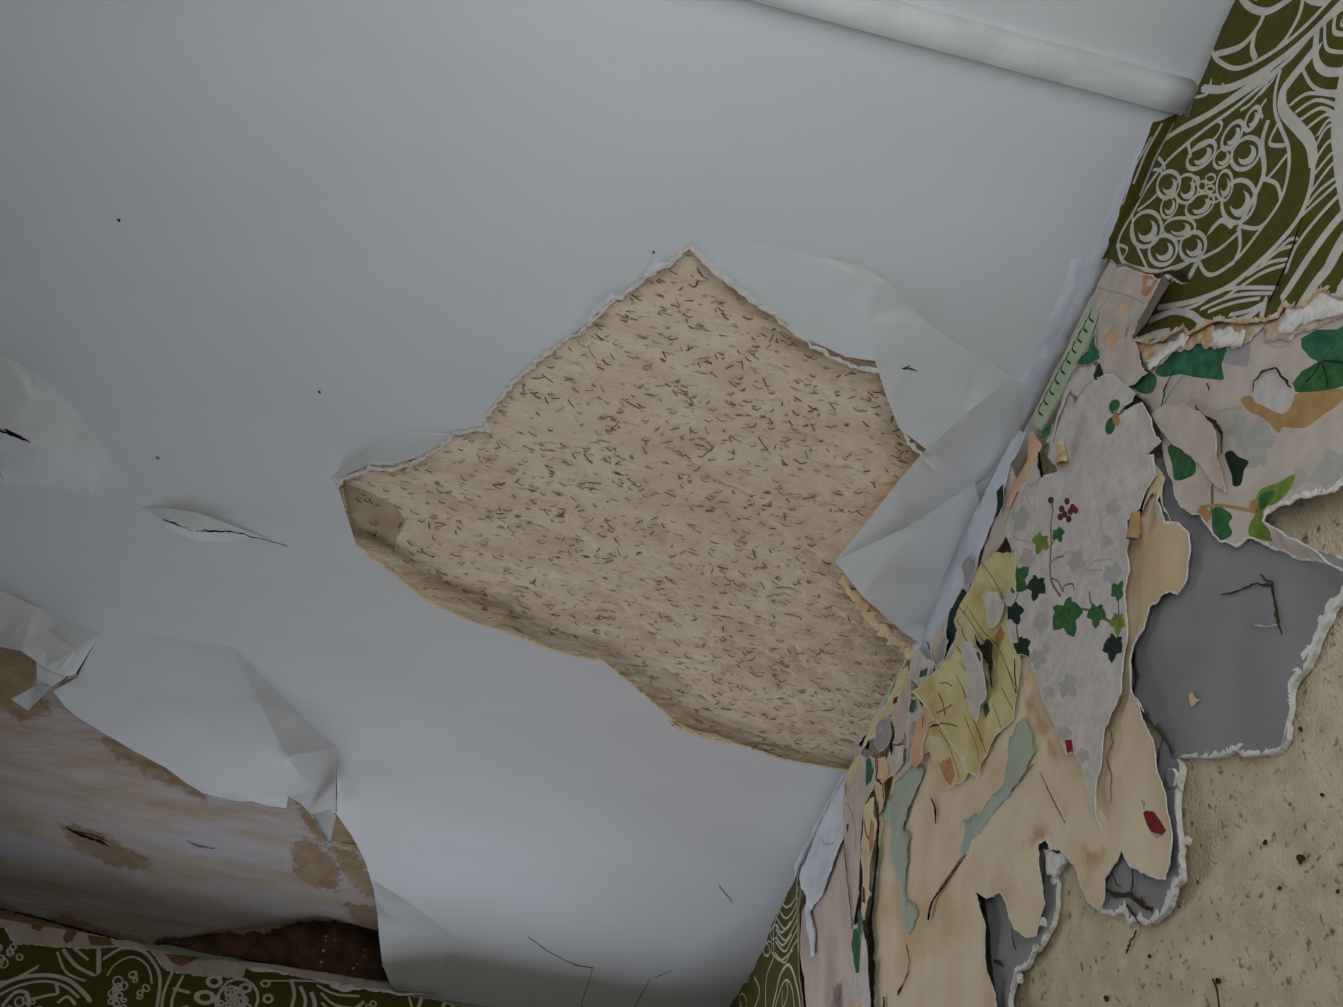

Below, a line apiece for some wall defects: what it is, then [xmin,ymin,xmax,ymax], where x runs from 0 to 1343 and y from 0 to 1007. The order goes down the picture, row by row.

flaking render [0,919,412,996]
flaking render [799,835,856,1007]
peeling [882,765,924,934]
peeling [961,717,1036,857]
flaking render [983,457,1343,1007]